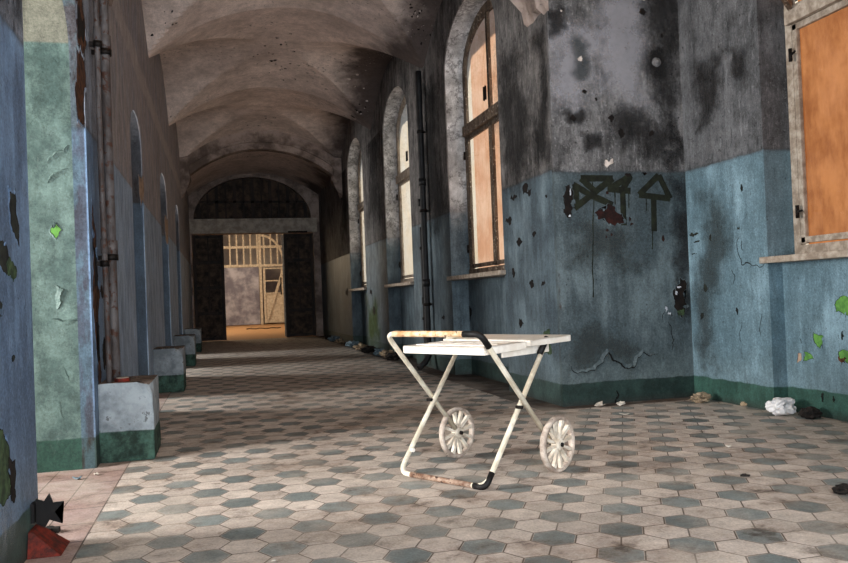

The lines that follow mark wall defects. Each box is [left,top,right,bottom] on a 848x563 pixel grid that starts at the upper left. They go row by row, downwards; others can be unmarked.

leakage [573,39,588,79]
leakage [566,110,584,123]
leakage [584,134,599,151]
leakage [614,107,678,156]
flaking render [665,278,689,319]
peeling [834,294,848,317]
peeling [796,331,825,364]
peeling [838,331,848,365]
peeling [0,427,16,509]